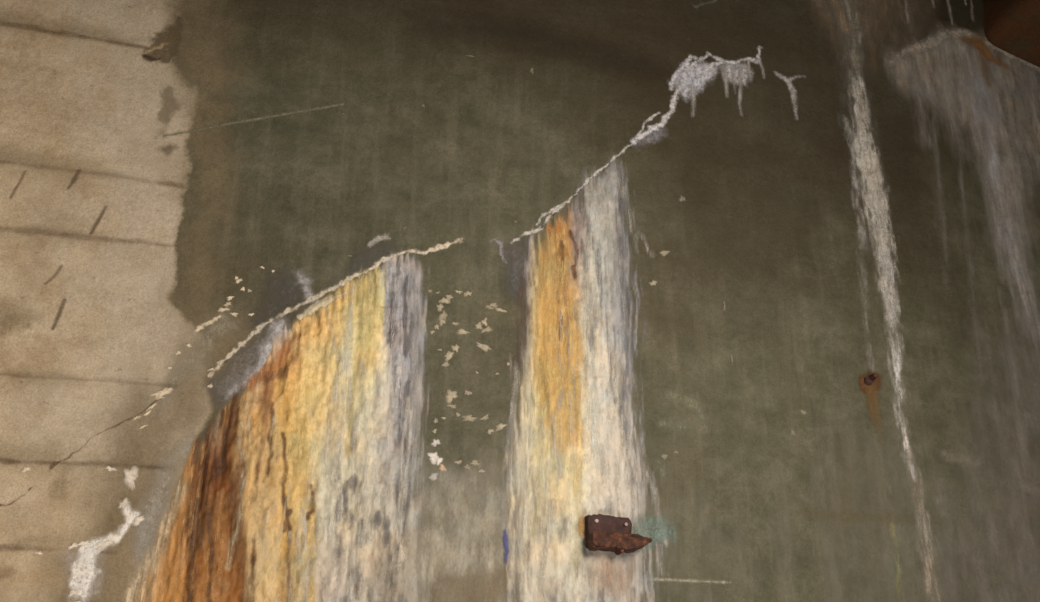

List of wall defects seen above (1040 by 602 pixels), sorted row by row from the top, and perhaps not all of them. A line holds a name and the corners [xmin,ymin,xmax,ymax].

water stain [675,46,800,116]
water stain [814,0,913,327]
water stain [891,0,1040,315]
peeling [133,276,254,429]
water stain [889,344,902,407]
water stain [900,420,940,600]